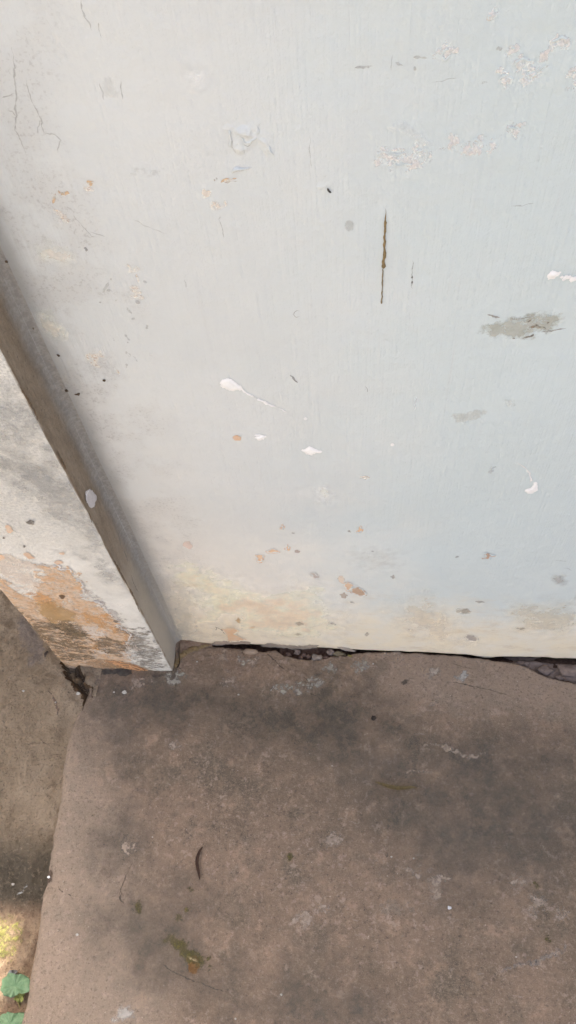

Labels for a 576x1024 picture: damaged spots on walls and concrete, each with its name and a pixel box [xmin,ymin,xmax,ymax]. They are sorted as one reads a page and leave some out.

peeling [85,489,97,523]
peeling [338,576,367,598]
peeling [0,552,160,678]
crack [174,627,341,711]
crack [347,649,576,695]